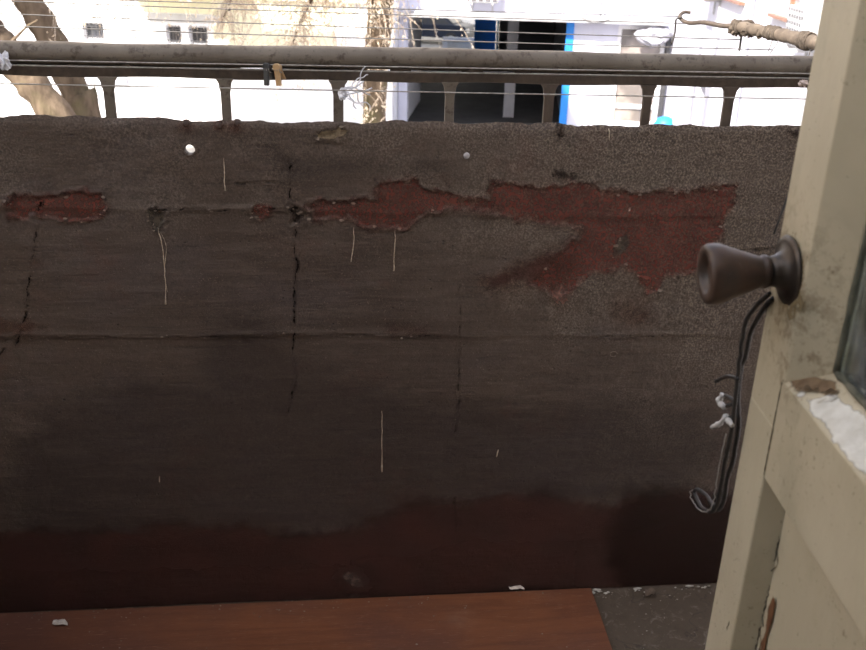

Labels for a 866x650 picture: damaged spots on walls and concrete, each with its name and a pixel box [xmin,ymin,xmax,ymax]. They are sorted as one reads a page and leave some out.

peeling [0,188,106,223]
crack [257,165,299,350]
peeling [286,169,740,298]
peeling [791,377,866,473]
leakage [613,496,731,586]
peeling [761,597,775,650]